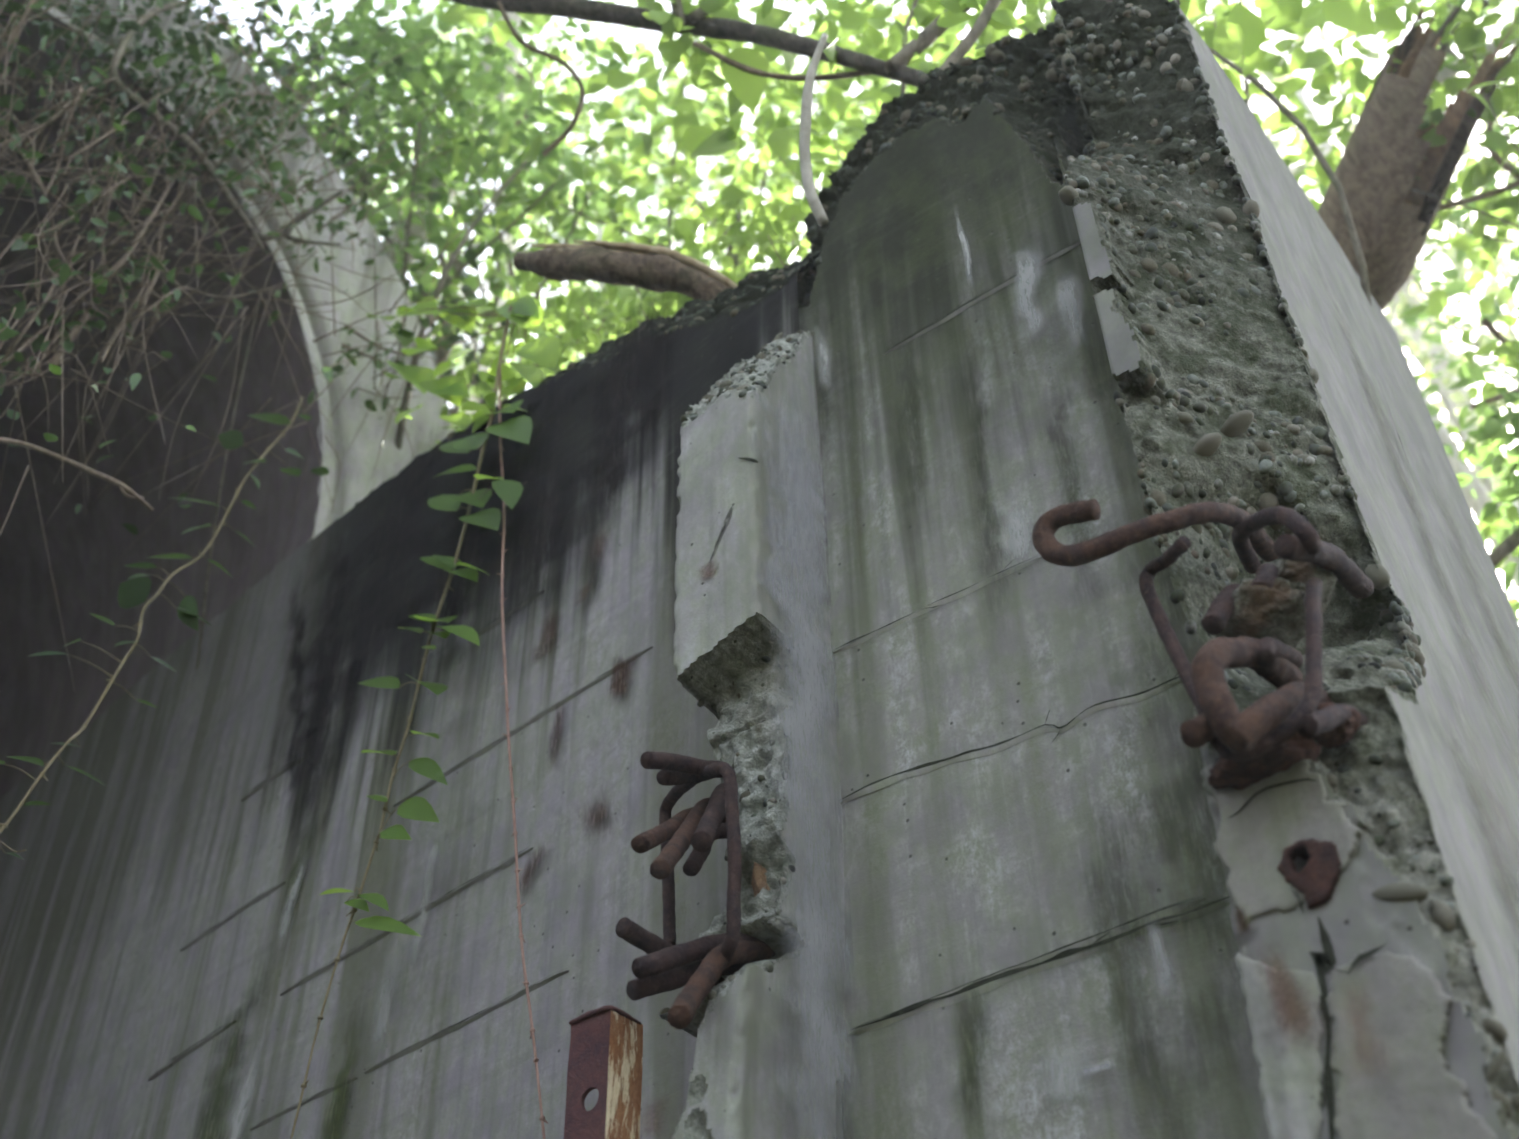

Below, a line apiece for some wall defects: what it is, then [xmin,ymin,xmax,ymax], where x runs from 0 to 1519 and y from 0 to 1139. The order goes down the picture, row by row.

efflorescence [960,231,970,274]
efflorescence [1019,256,1040,328]
water stain [285,315,670,824]
spalling [495,0,1519,1139]
rust [1277,838,1342,909]
crack [1290,889,1388,1139]